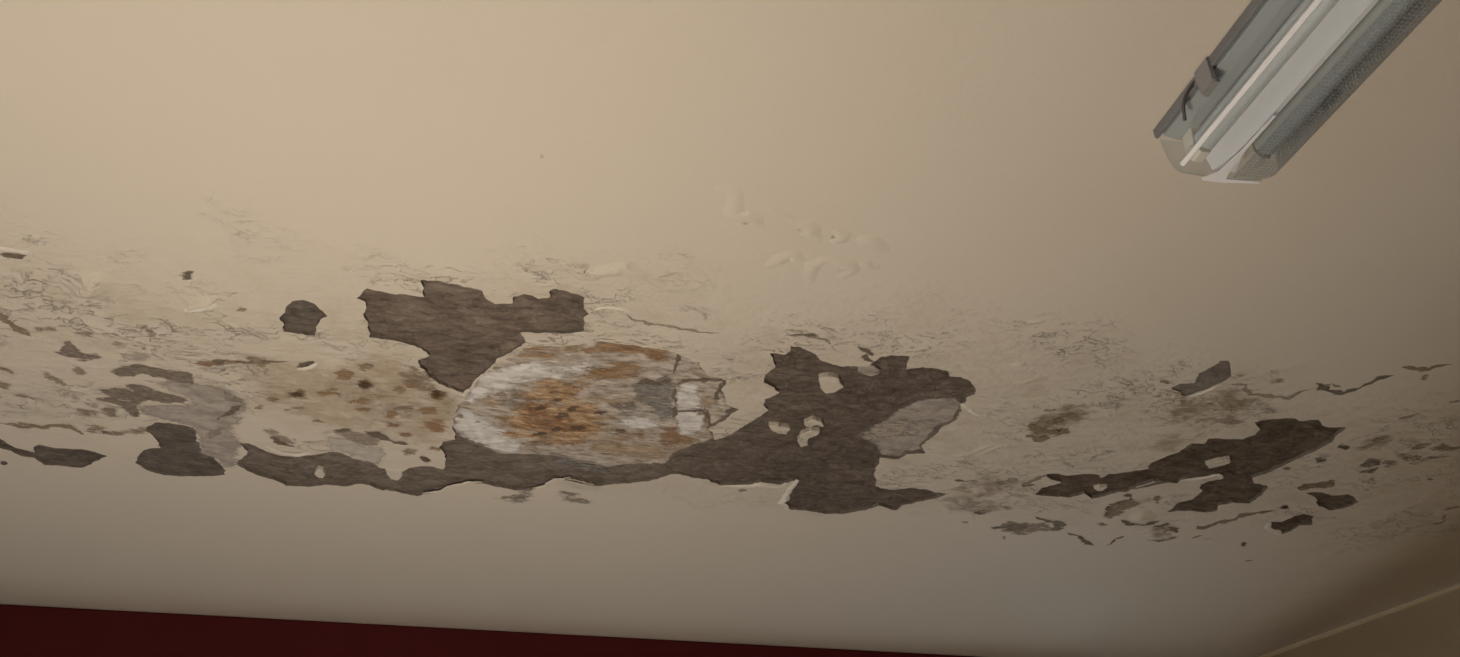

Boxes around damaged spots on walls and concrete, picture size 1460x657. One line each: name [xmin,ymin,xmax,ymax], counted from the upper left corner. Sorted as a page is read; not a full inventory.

water stain [2,367,116,435]
corrosion [198,357,270,367]
corrosion [255,342,716,459]
spalling [0,280,976,514]
water stain [452,341,736,472]
water stain [1026,407,1082,442]
spalling [1172,361,1231,398]
water stain [1173,380,1312,423]
water stain [501,488,531,502]
water stain [560,491,590,504]
spalling [992,418,1460,546]